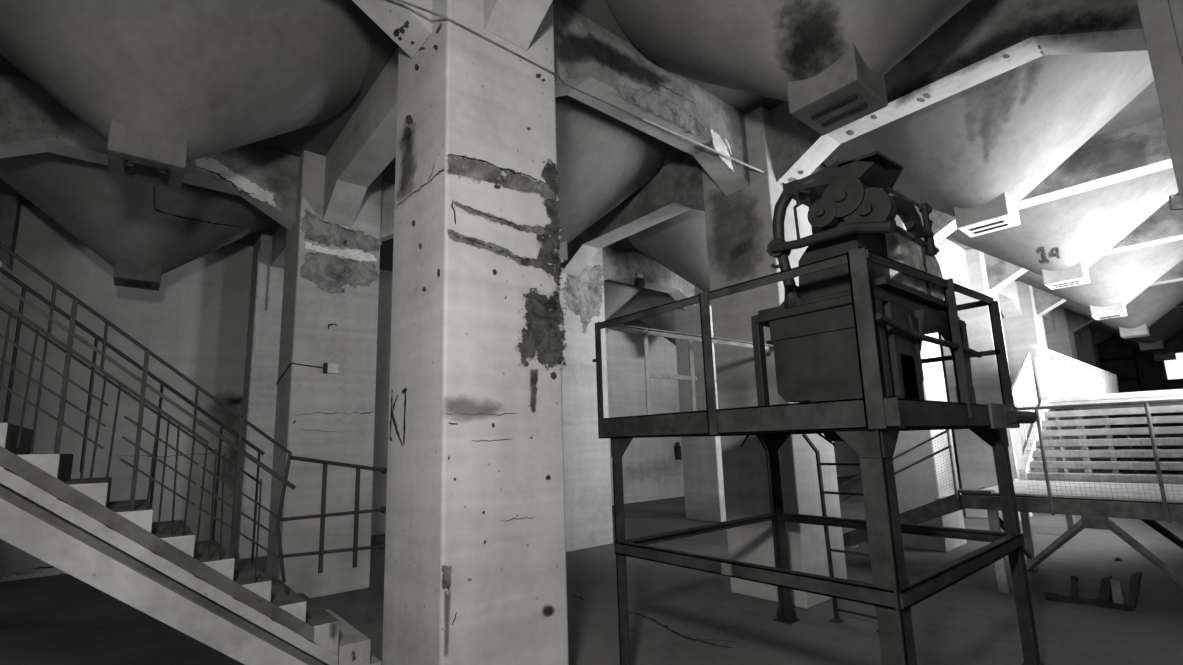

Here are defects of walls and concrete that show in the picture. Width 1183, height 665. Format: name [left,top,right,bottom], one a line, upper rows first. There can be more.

peeling [195,156,277,207]
spalling [301,208,382,294]
peeling [447,154,604,413]
damp [448,401,492,416]
crack [629,612,733,648]